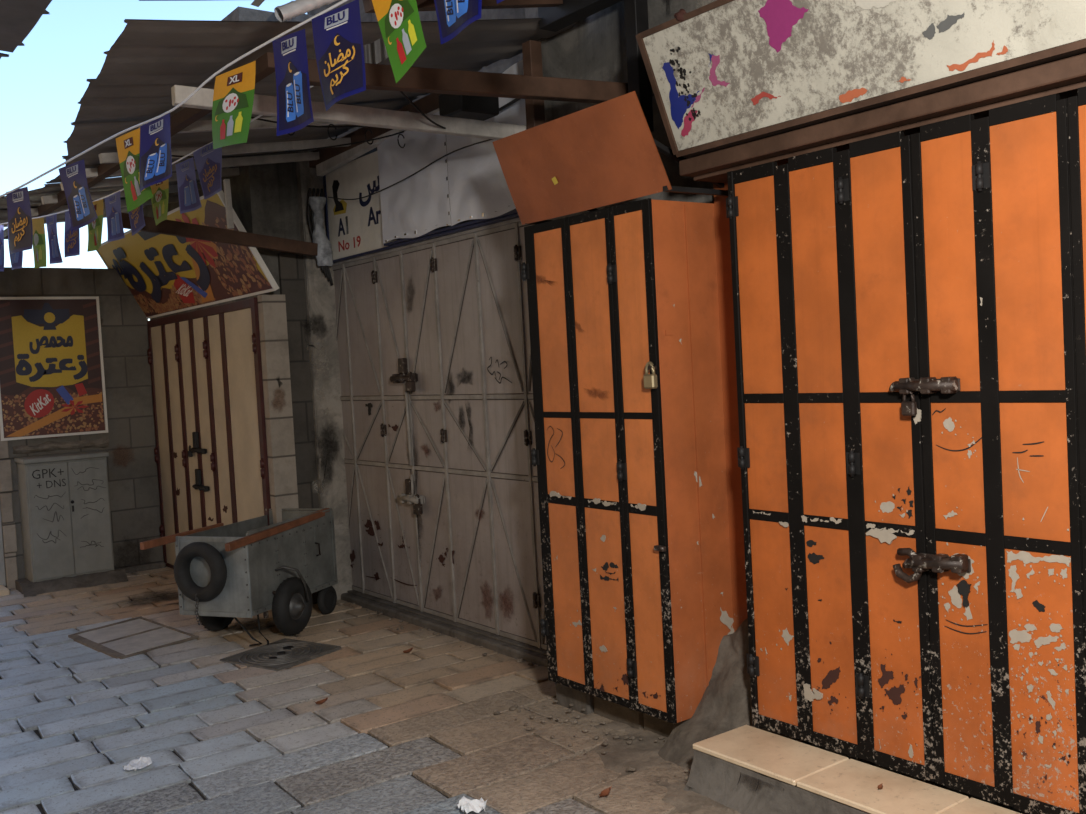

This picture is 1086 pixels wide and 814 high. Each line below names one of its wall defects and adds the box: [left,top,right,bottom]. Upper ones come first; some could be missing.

peeling [942,417,977,458]
spalling [801,515,842,524]
spalling [865,487,915,544]
peeling [591,562,618,581]
peeling [806,540,824,564]
peeling [938,543,983,627]
peeling [786,658,848,714]
peeling [878,653,921,720]
peeling [1006,551,1074,783]